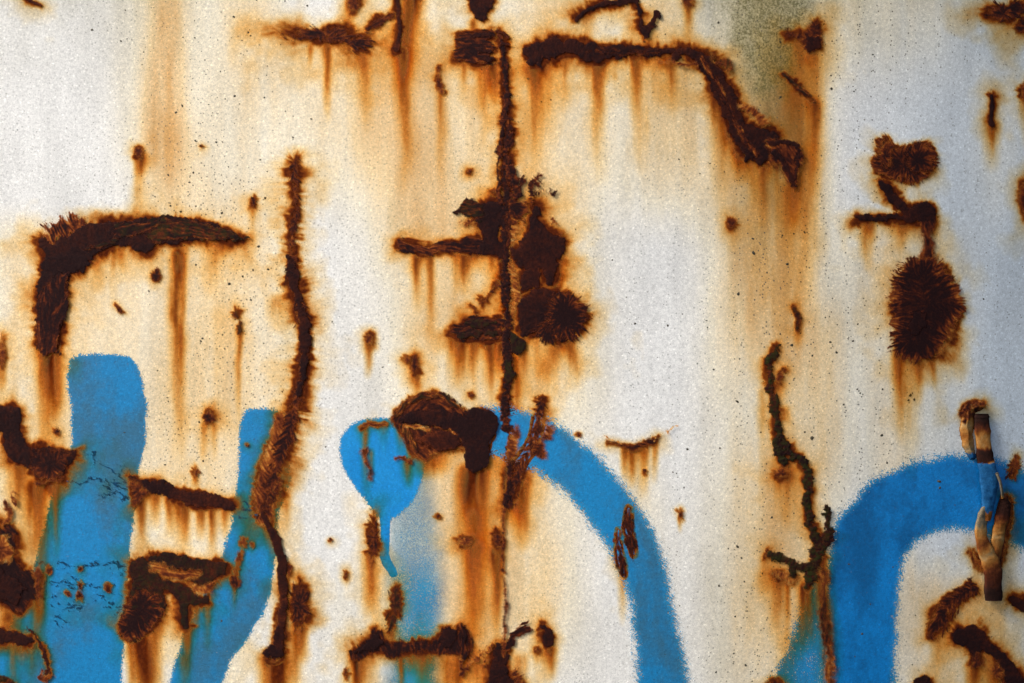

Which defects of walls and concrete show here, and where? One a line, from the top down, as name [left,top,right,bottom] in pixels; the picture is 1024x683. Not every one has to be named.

rust [269,0,378,78]
rust [449,0,804,189]
rust [31,212,250,407]
rust [393,173,593,375]
rust [849,134,966,385]
rust [0,400,84,652]
rust [104,537,254,683]
rust [125,412,286,531]
rust [262,562,315,683]
rust [358,352,503,592]
rust [343,582,556,683]
rust [925,548,1024,683]